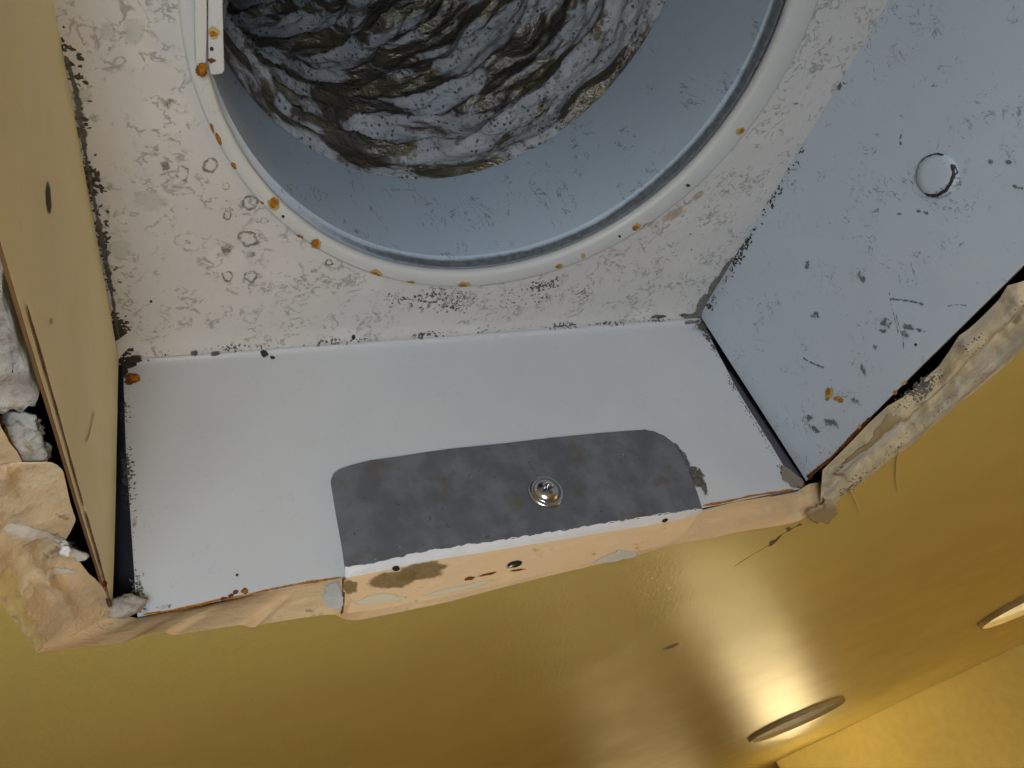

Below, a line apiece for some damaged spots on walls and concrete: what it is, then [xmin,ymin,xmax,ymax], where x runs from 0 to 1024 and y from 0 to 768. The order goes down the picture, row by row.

corrosion [195,58,216,77]
corrosion [259,197,279,210]
damp [61,25,142,430]
damp [386,287,476,313]
damp [501,276,588,305]
corrosion [825,388,843,403]
peeling [834,412,903,476]
crack [734,525,800,567]
damp [129,532,146,613]
corrosion [143,577,340,615]